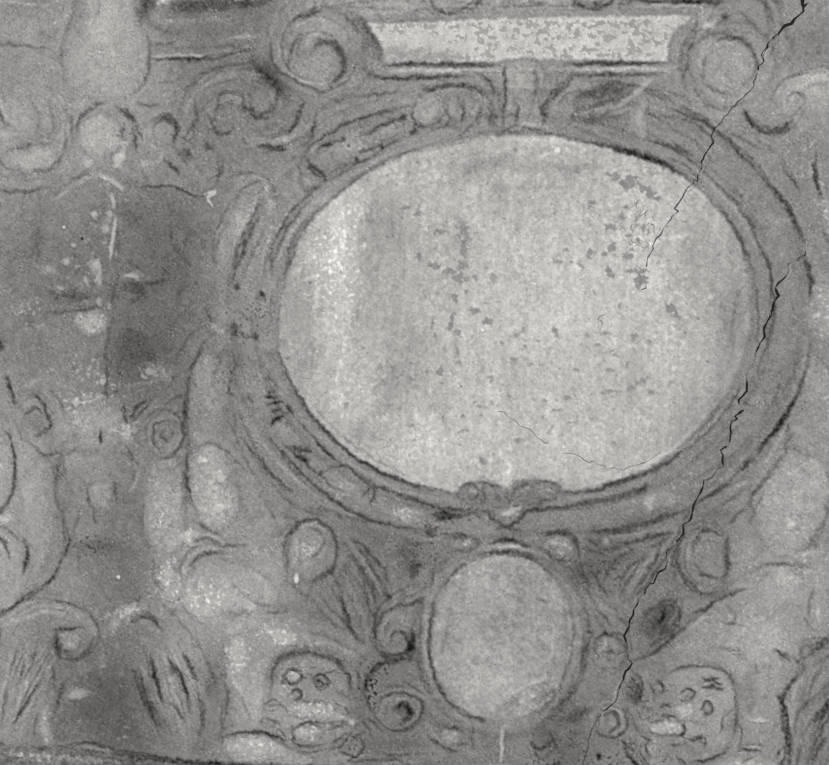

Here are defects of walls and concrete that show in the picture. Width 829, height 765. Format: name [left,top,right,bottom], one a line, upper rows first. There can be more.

peeling [367,14,717,65]
crack [646,0,808,267]
peeling [575,168,664,292]
peeling [582,314,632,374]
peeling [661,300,682,320]
crack [753,250,806,354]
crack [583,375,748,765]